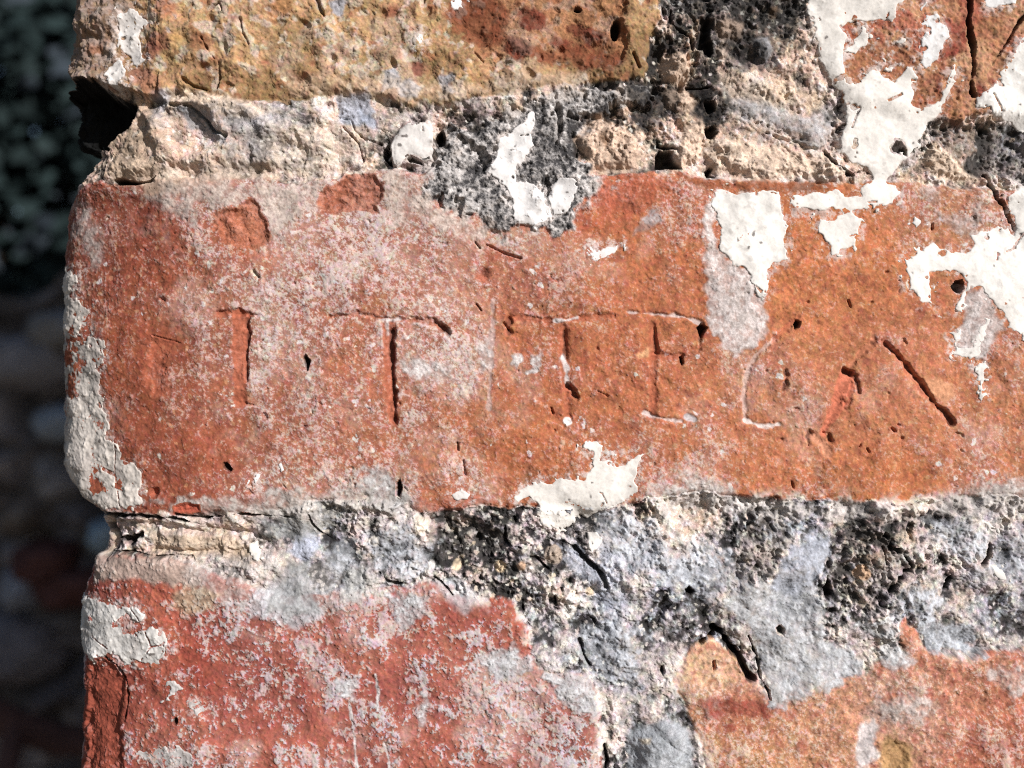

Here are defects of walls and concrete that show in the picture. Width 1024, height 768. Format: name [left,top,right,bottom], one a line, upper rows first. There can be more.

crack [965,0,1024,99]
spalling [387,0,655,239]
peeling [660,0,1024,401]
peeling [62,267,148,511]
peeling [514,441,644,534]
peeling [587,531,605,552]
crack [698,622,772,701]